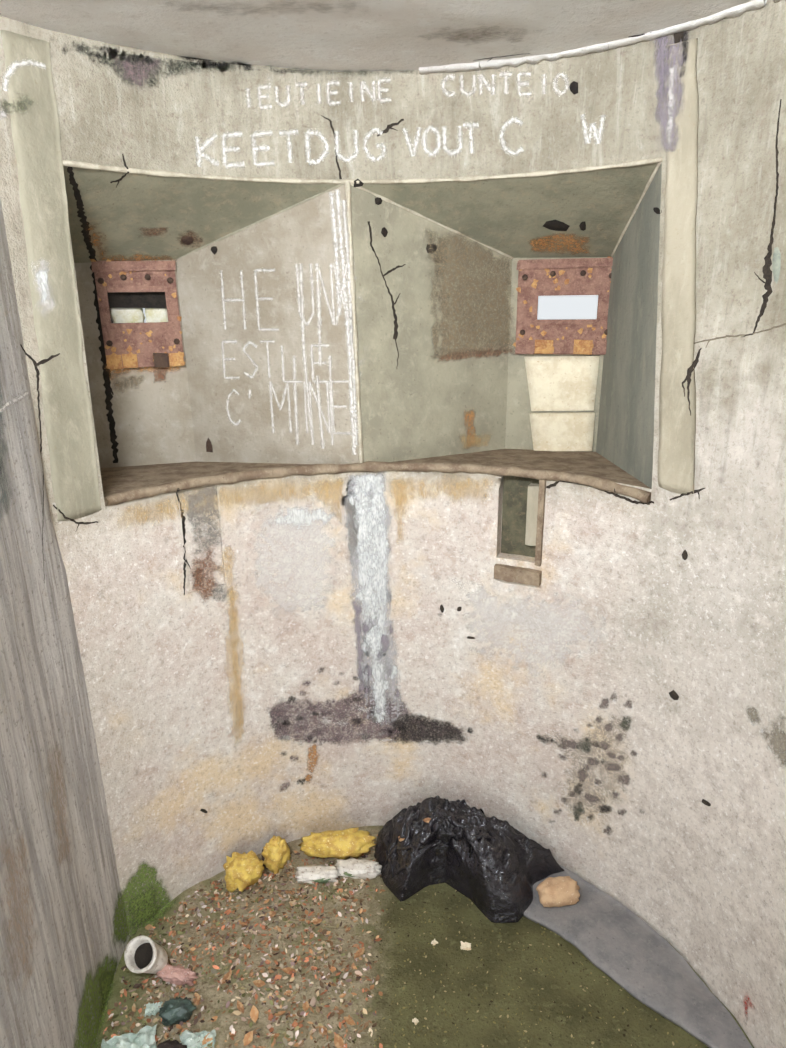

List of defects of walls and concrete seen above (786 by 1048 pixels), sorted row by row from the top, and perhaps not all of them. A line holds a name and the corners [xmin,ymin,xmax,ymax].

damp [63,45,250,87]
damp [655,32,688,151]
crack [367,221,406,366]
crack [682,99,786,416]
damp [257,508,333,610]
damp [270,473,472,745]